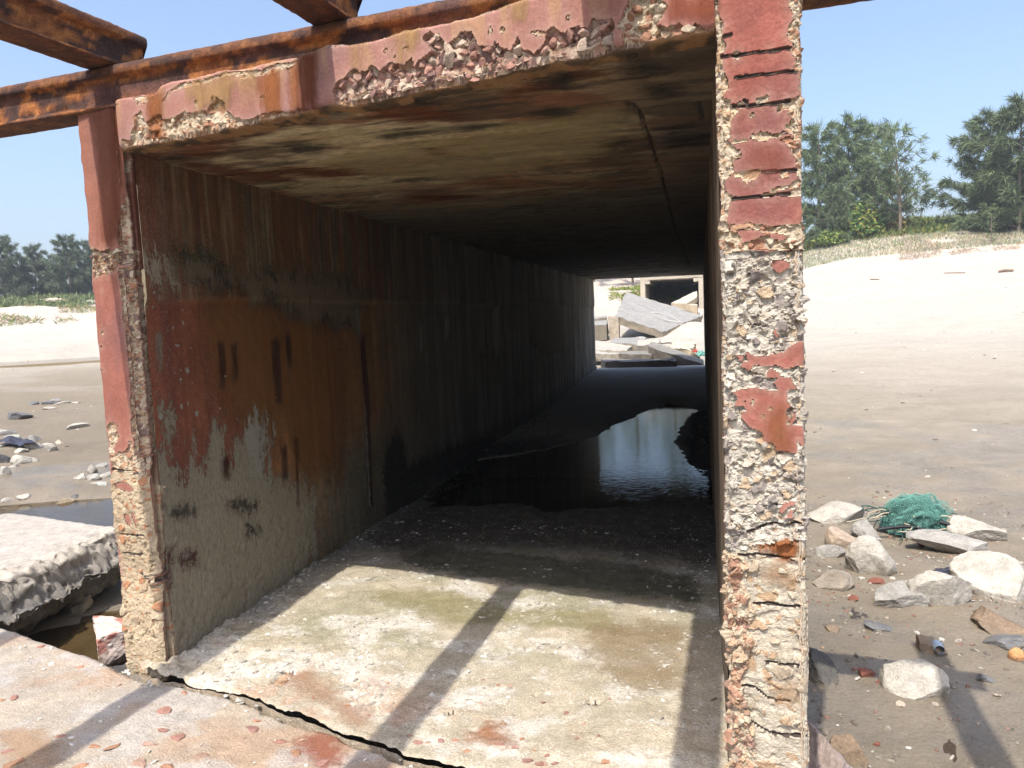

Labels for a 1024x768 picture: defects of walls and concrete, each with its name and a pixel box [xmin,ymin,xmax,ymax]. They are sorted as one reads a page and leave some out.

rust [396,30,415,63]
rust [259,55,316,113]
rust [148,94,162,140]
crack [626,101,691,265]
peeling [90,96,328,681]
spalling [333,0,811,768]
leakage [380,428,497,518]
crack [738,518,806,561]
crack [753,601,801,609]
crack [742,661,806,702]
crack [224,695,282,722]
crack [749,721,807,738]